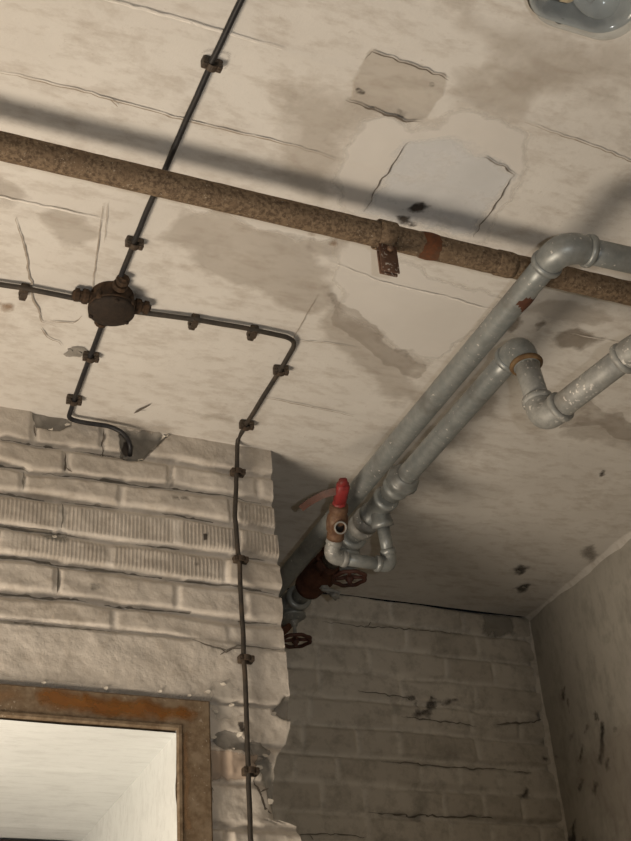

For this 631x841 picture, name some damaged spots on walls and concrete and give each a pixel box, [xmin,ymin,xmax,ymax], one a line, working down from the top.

crack [0,196,108,346]
spalling [119,429,169,462]
corrosion [39,690,196,719]
crack [360,691,473,727]
crack [496,718,541,726]
peeling [211,722,274,815]